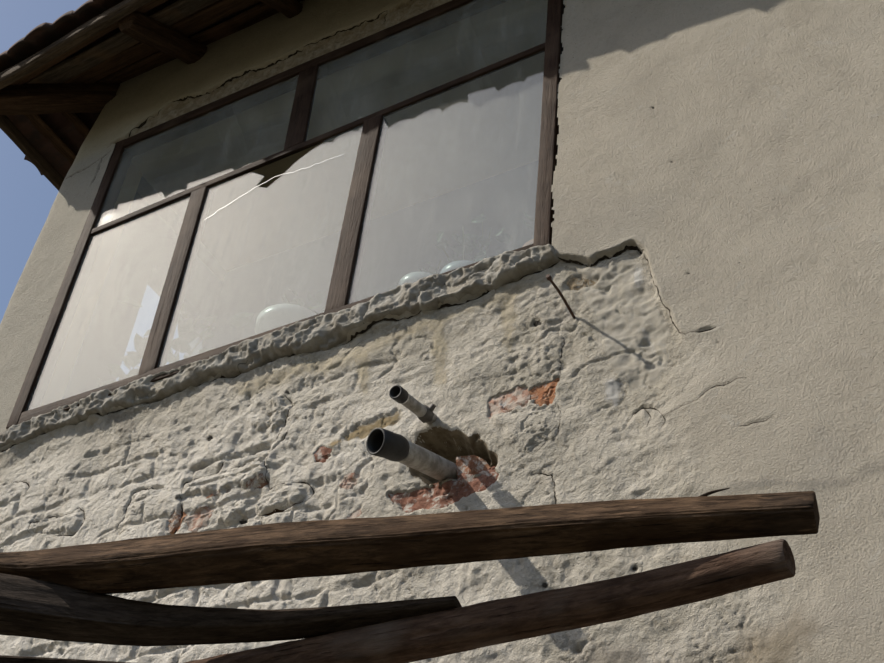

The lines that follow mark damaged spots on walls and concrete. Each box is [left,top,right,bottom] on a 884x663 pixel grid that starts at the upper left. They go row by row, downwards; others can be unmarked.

spalling [567,277,598,290]
crack [509,245,716,333]
crack [335,290,489,347]
flaking render [488,378,560,419]
crack [630,377,747,427]
flaking render [246,473,269,489]
flaking render [314,446,332,463]
flaking render [339,472,360,489]
spalling [388,426,499,513]
flaking render [168,488,230,535]